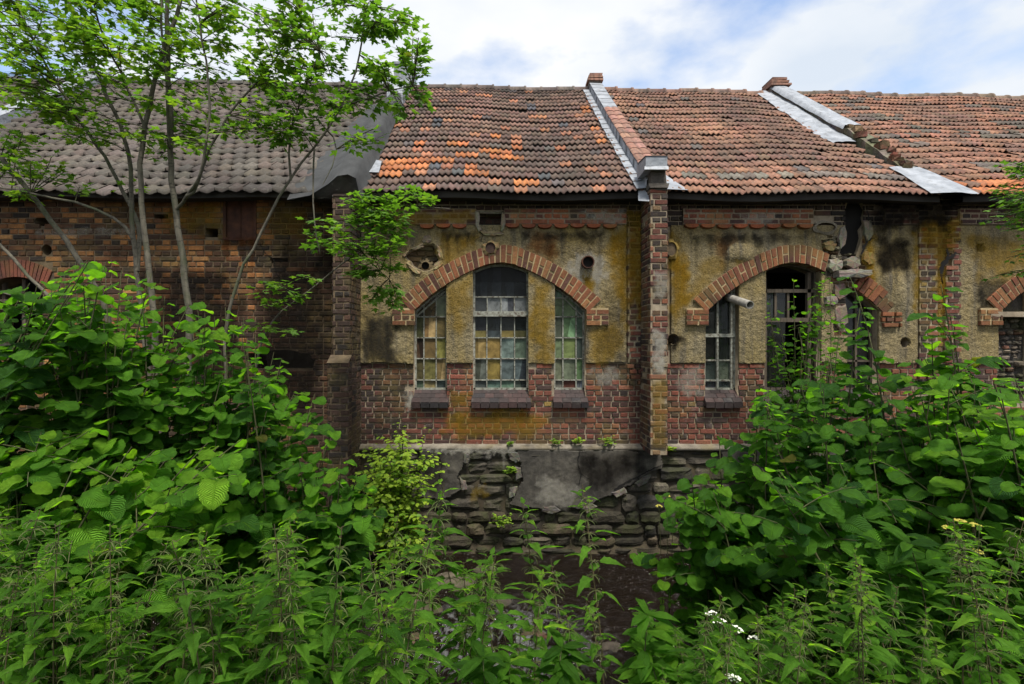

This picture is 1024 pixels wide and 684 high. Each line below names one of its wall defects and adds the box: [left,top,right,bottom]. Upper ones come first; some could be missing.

spalling [402,235,443,275]
peeling [837,226,847,251]
peeling [861,220,874,266]
peeling [833,283,848,329]
leakage [362,317,396,362]
flaking render [508,452,522,498]
flaking render [611,474,651,497]